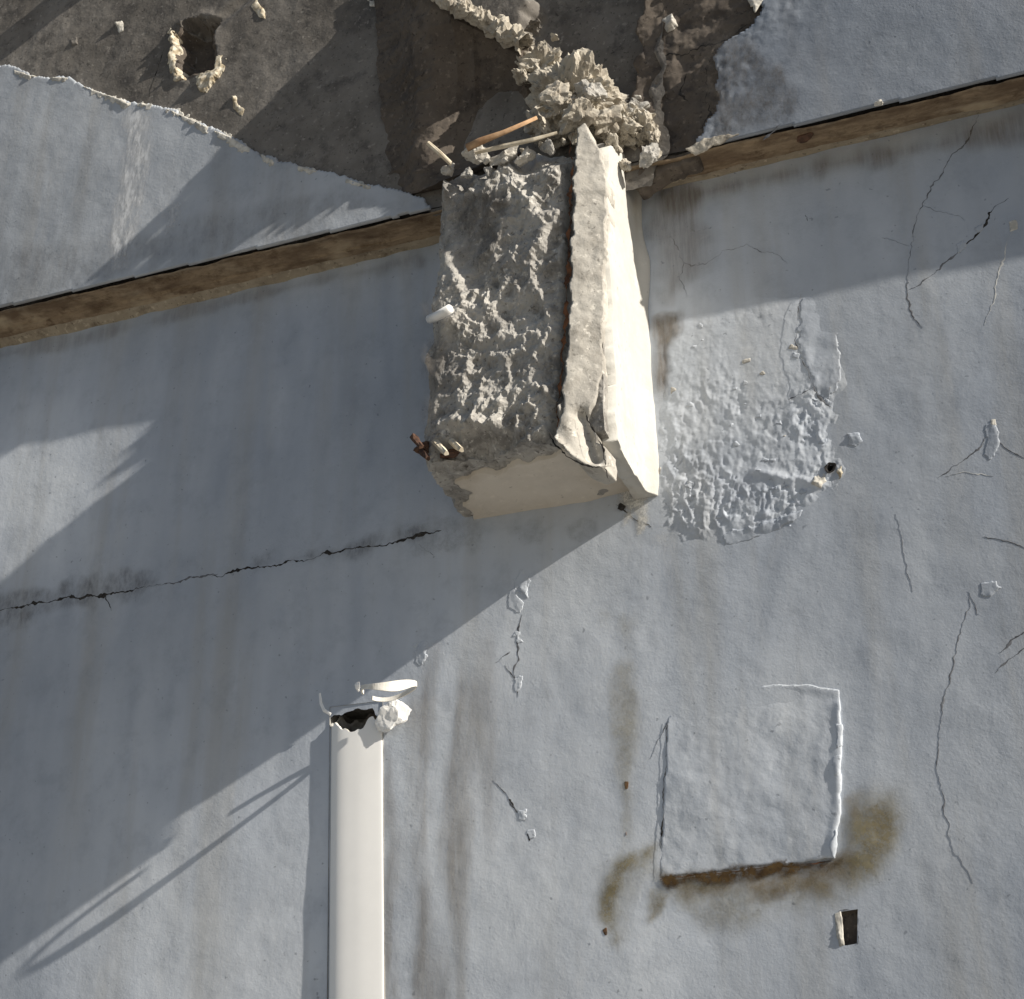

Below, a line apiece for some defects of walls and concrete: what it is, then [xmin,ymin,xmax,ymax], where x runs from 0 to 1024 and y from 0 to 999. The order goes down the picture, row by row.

spalling [0,0,763,216]
crack [884,118,1007,327]
rust [413,441,460,459]
crack [938,419,1022,478]
crack [0,530,441,611]
crack [502,616,522,693]
crack [936,597,977,878]
rust [661,802,896,894]
rust [601,850,650,935]
spalling [834,911,844,946]